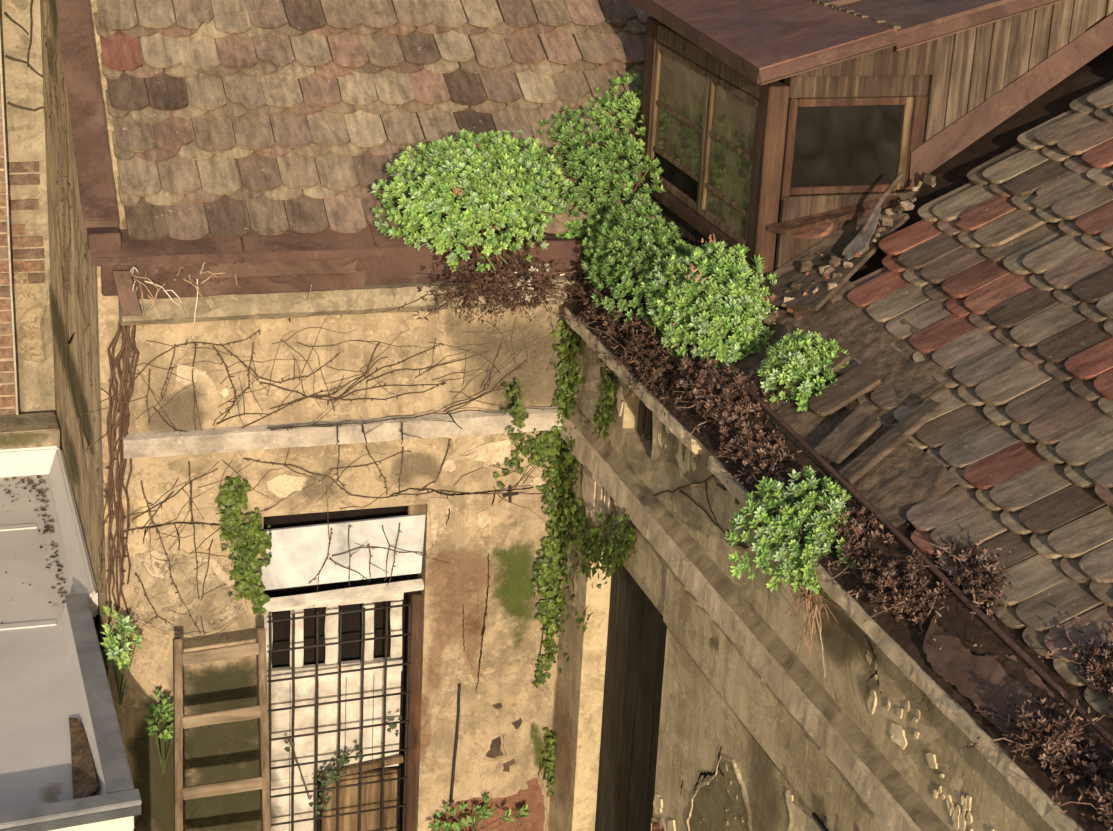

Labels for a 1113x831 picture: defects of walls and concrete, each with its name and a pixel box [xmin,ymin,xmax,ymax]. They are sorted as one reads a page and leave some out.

flaking render [651,412,754,555]
peeling [866,644,929,750]
flaking render [429,699,549,831]
flaking render [650,752,752,831]
crack [680,747,725,795]
peeling [785,789,823,831]
peeling [926,753,973,831]